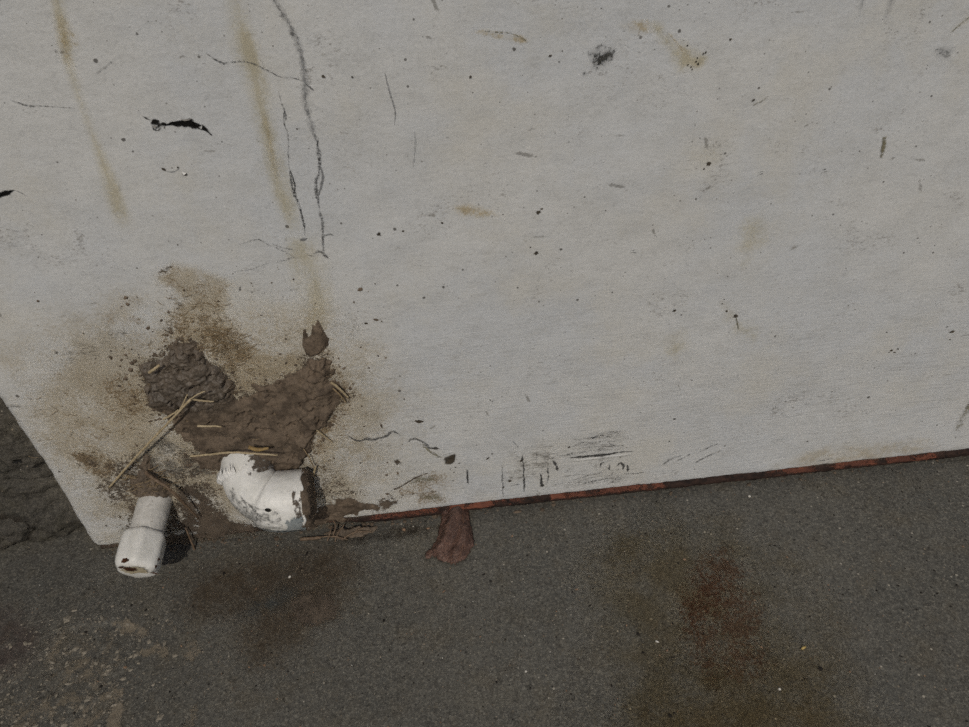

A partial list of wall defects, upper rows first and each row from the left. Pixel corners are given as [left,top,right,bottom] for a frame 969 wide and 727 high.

rust [771,465,816,473]
rust [832,452,936,469]
rust [550,482,665,500]
rust [370,498,520,520]